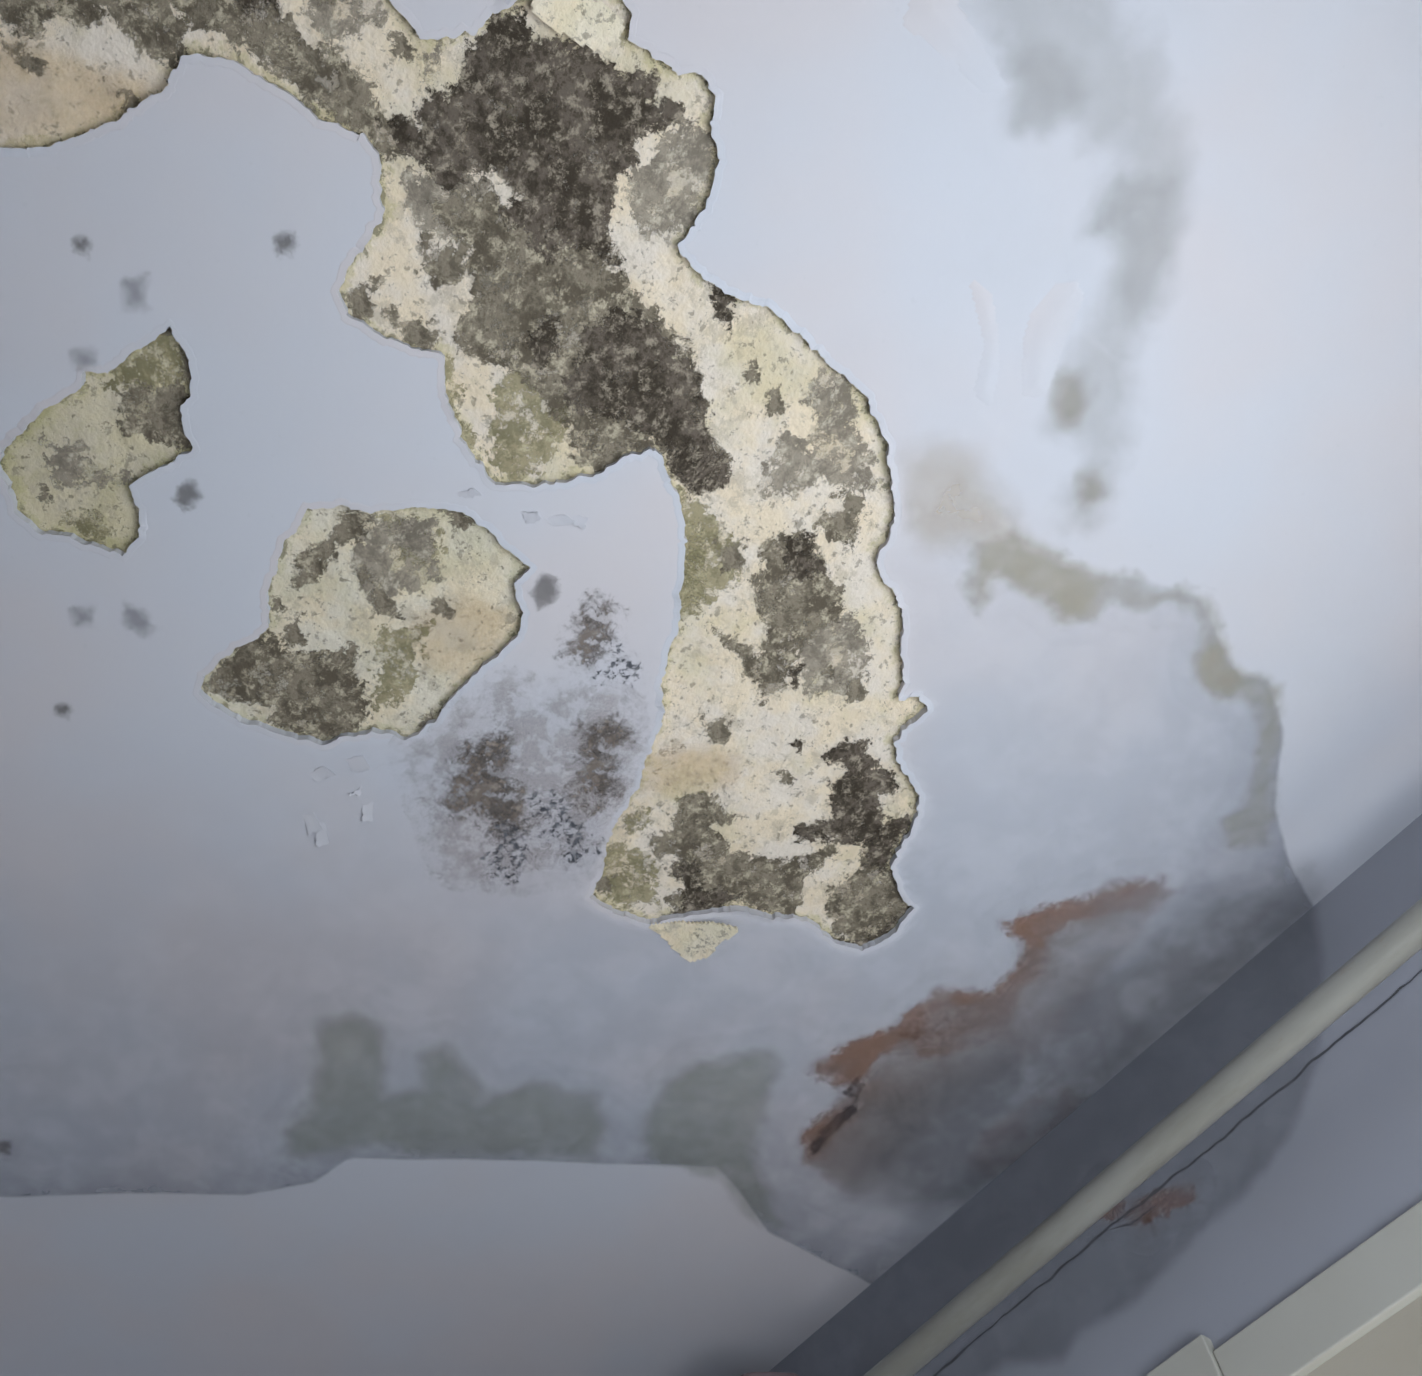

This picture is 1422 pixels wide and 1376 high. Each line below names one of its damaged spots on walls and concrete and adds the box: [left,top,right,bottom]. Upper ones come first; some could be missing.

peeling [0,0,934,963]
water stain [536,577,555,607]
water stain [561,596,642,693]
water stain [442,713,634,886]
corrosion [808,1008,932,1154]